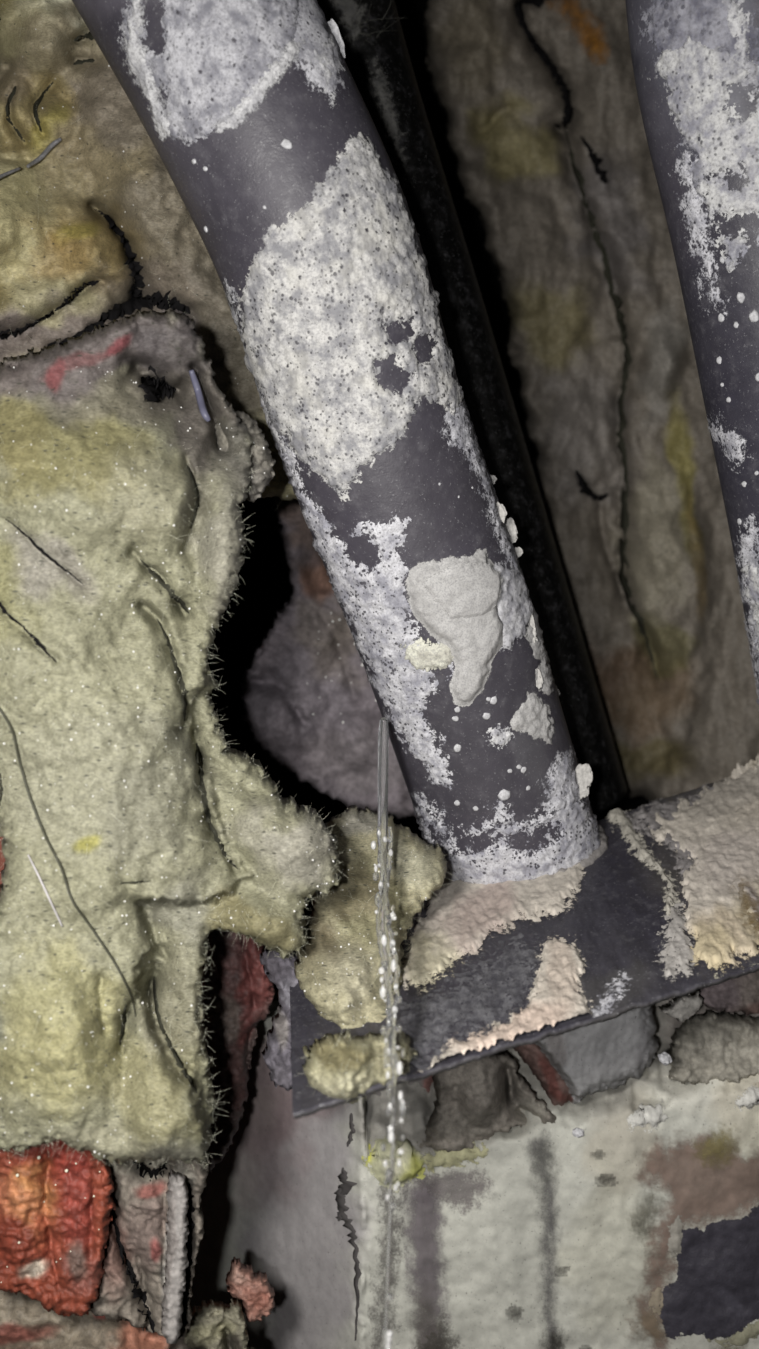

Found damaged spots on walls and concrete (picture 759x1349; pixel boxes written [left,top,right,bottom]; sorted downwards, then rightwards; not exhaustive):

damp [118,0,367,147]
damp [632,0,759,315]
damp [222,56,759,994]
damp [416,934,632,1073]
damp [361,1131,490,1349]
damp [532,1140,562,1349]
damp [632,1195,656,1234]
peeling [648,1206,759,1347]